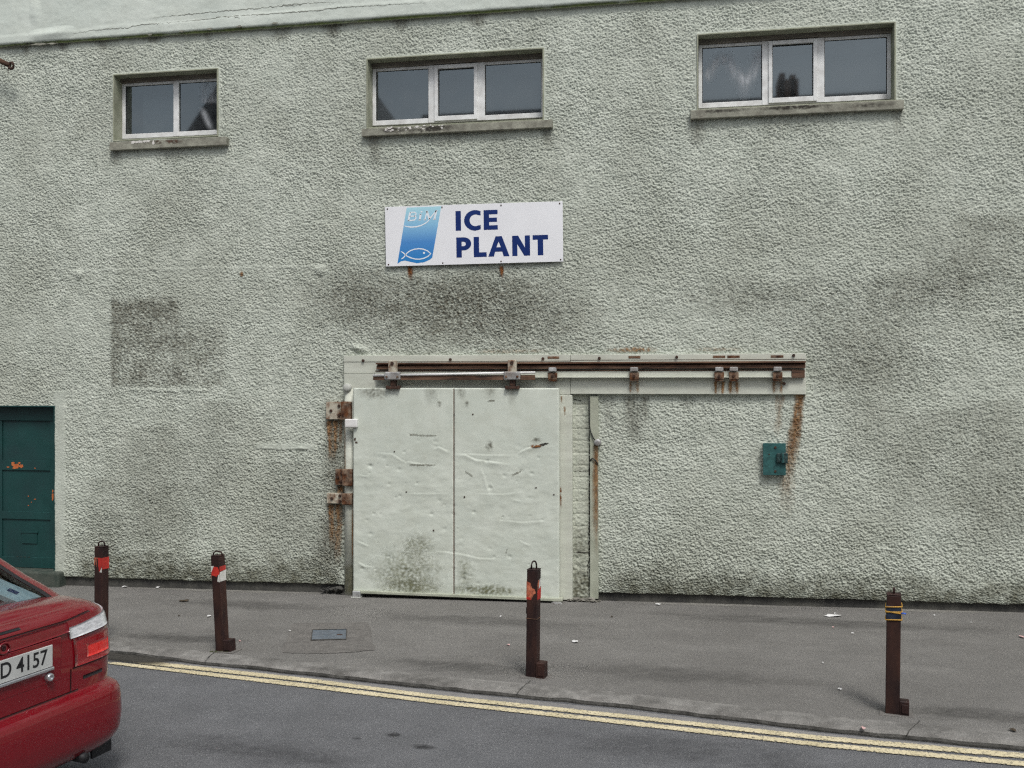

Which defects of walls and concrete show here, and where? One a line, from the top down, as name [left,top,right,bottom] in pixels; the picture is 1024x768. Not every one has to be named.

water stain [112,301,185,381]
rust [327,420,342,452]
rust [788,394,804,470]
rust [328,504,353,555]